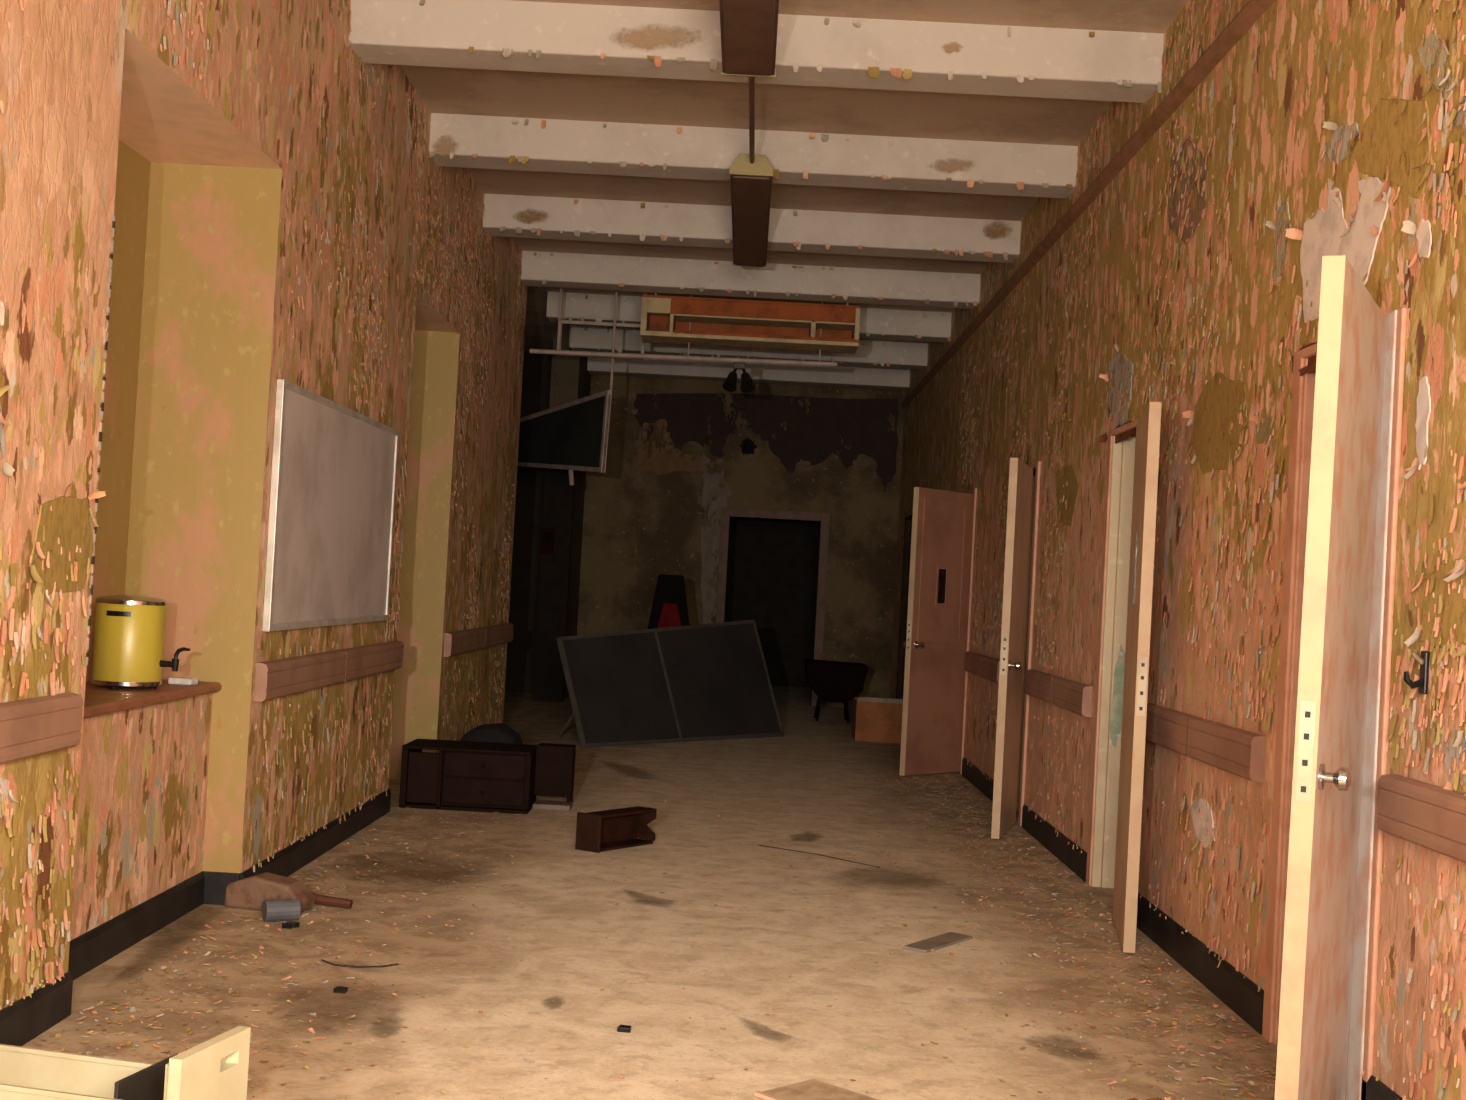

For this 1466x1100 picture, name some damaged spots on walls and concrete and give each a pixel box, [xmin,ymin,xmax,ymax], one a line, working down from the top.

peeling [160,0,209,98]
damp [618,28,693,49]
damp [936,160,972,173]
peeling [287,86,553,643]
peeling [1099,0,1466,732]
peeling [629,393,899,624]
peeling [0,770,79,1010]
peeling [250,677,394,872]
peeling [1109,645,1125,748]
peeling [1140,772,1264,992]
peeling [1381,873,1466,1100]
peeling [1386,450,1466,796]